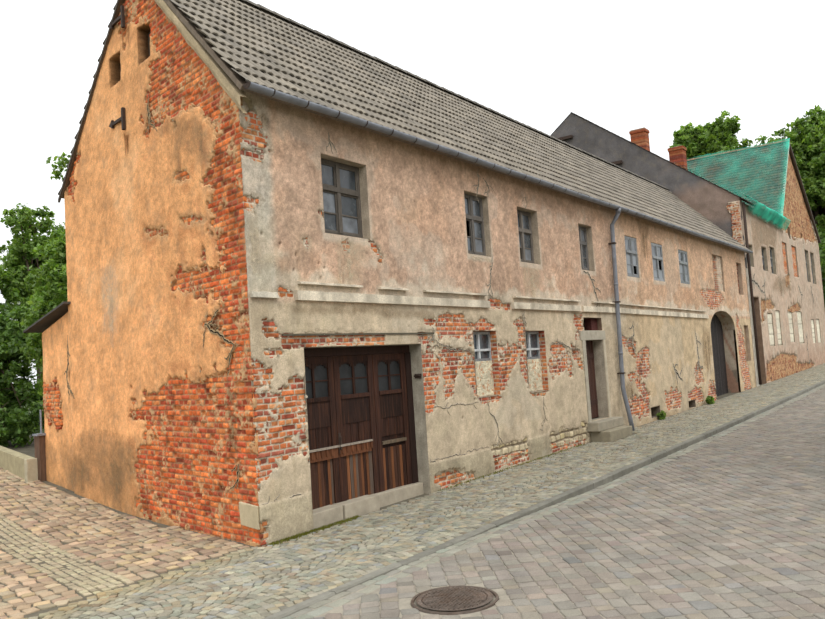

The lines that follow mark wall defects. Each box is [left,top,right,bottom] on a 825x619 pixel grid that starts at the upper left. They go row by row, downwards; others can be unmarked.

spalling [118,0,385,547]
crack [486,256,494,301]
spalling [488,298,510,311]
crack [203,309,234,376]
spalling [418,312,528,415]
spalling [548,313,584,380]
spalling [622,334,650,420]
spalling [665,362,717,411]
spalling [736,315,752,391]
spalling [766,353,814,382]
crack [428,402,503,478]
flaking render [491,437,530,470]